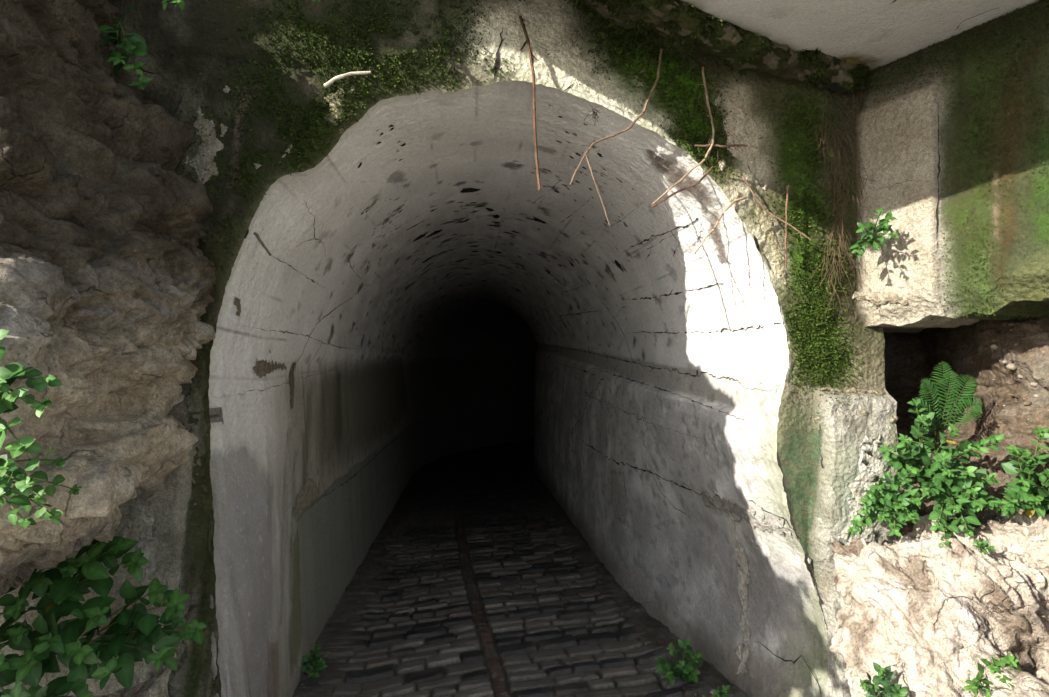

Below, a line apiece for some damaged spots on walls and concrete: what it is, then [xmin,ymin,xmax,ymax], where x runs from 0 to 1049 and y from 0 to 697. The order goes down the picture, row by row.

peeling [253,359,296,409]
crack [212,200,375,399]
crack [625,210,707,261]
crack [550,282,828,634]